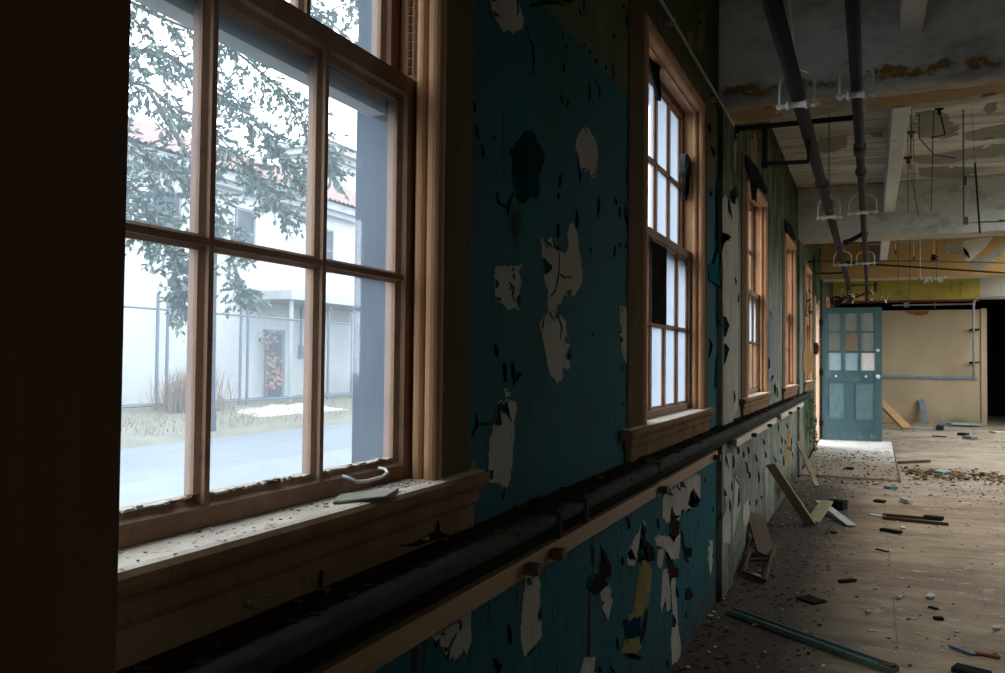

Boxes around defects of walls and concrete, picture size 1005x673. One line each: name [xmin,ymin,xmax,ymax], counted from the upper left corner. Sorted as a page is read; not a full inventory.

peeling [490,0,524,33]
rust [867,59,955,80]
peeling [575,127,598,178]
peeling [866,85,1005,178]
peeling [494,264,522,311]
peeling [539,222,583,384]
peeling [714,178,739,425]
peeling [488,388,517,499]
peeling [708,453,750,574]
peeling [621,472,701,665]
peeling [520,576,542,659]